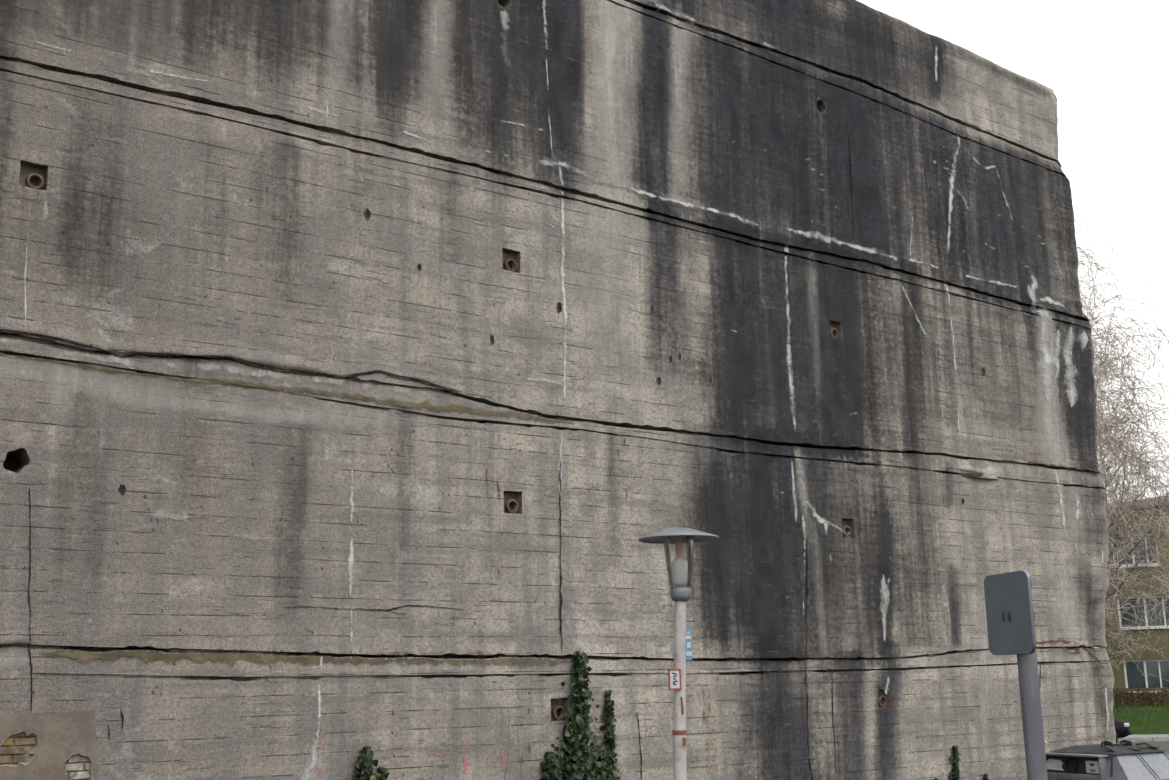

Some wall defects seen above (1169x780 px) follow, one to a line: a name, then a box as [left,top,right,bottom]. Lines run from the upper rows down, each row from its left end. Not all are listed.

leakage [378,0,436,112]
leakage [435,0,584,398]
crack [0,331,459,394]
leakage [206,365,266,376]
leakage [600,0,1096,780]
crack [26,487,34,711]
spalling [0,731,39,767]
spalling [64,753,94,780]
leakage [303,686,321,780]